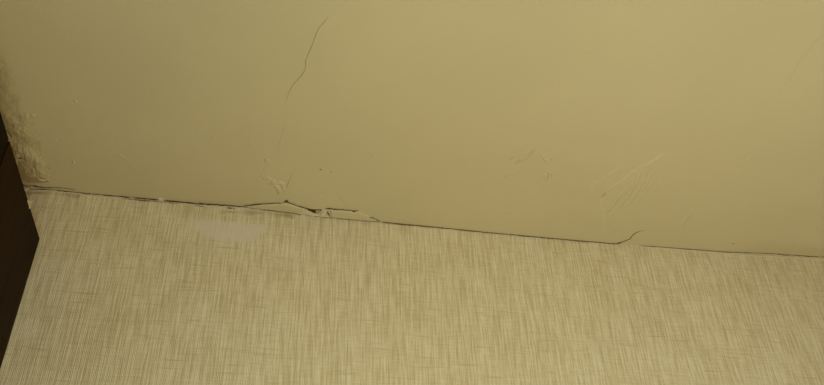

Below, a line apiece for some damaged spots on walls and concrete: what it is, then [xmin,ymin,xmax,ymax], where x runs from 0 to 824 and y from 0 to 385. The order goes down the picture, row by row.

flaking render [0,48,55,183]
crack [23,185,824,258]